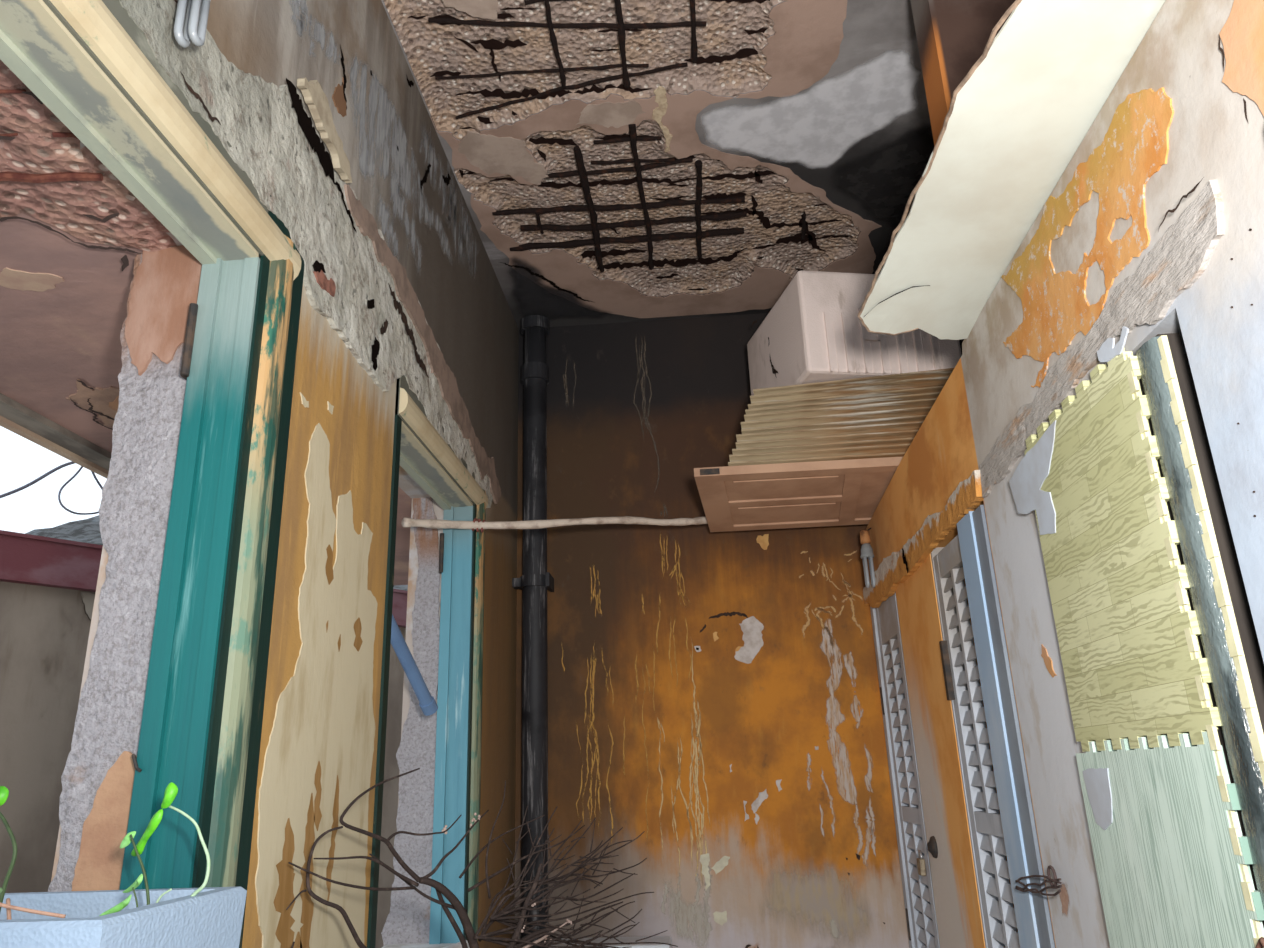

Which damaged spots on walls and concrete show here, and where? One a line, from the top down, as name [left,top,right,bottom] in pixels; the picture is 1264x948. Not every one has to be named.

flaking render [119,0,501,508]
spalling [383,0,882,318]
peeling [1001,87,1174,388]
flaking render [0,60,202,892]
peeling [255,423,378,948]
flaking render [381,497,440,946]
damp [590,568,602,617]
damp [576,646,625,843]
damp [635,534,711,944]
damp [799,550,863,649]
peeling [807,619,876,865]
damp [768,870,867,939]